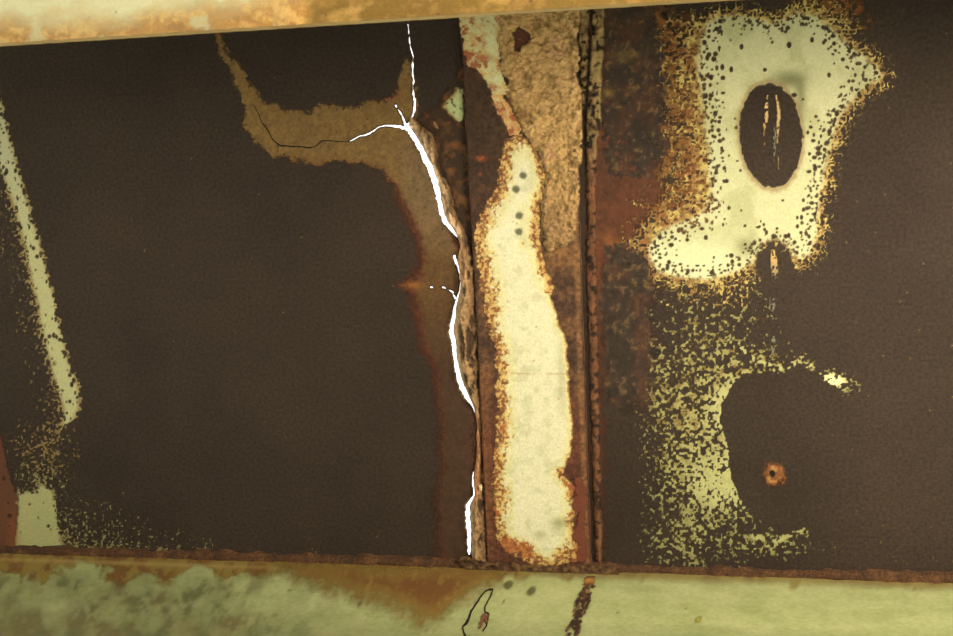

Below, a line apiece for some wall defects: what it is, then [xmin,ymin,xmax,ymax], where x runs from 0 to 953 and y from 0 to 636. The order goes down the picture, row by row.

crack [254,24,475,413]
corrosion [0,0,730,636]
peeling [442,88,464,122]
crack [463,472,474,555]
peeling [621,0,896,568]
corrosion [764,463,786,486]